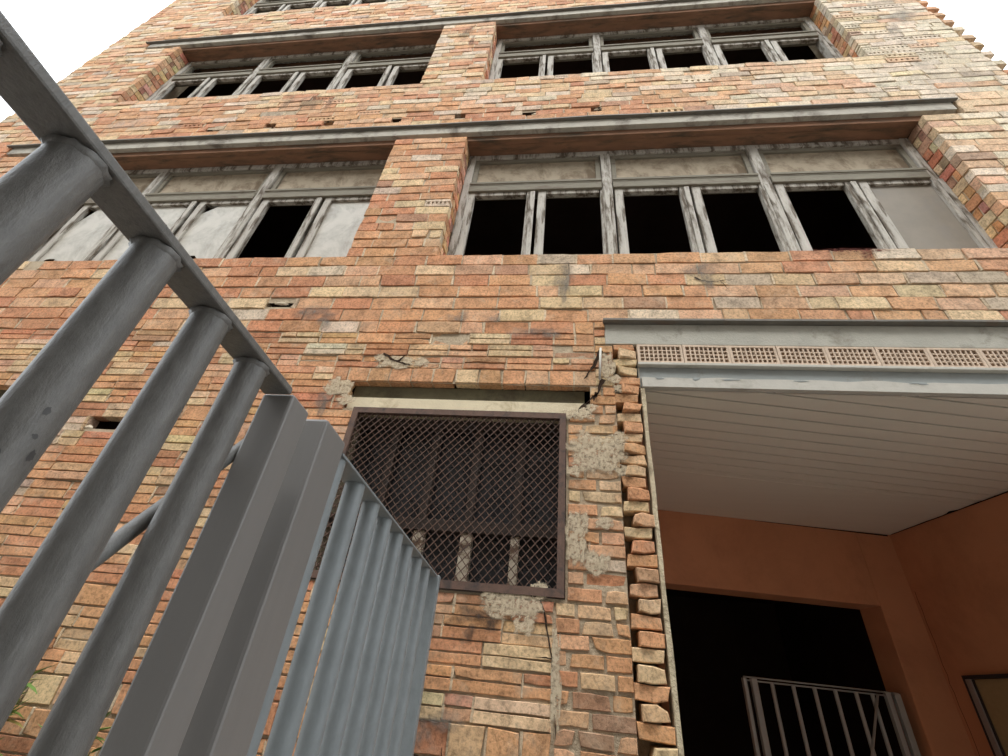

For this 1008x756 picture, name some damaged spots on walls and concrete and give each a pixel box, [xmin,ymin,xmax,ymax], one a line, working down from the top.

spalling [374,353,429,369]
peeling [595,515,614,530]
peeling [584,550,610,576]
peeling [514,615,534,636]